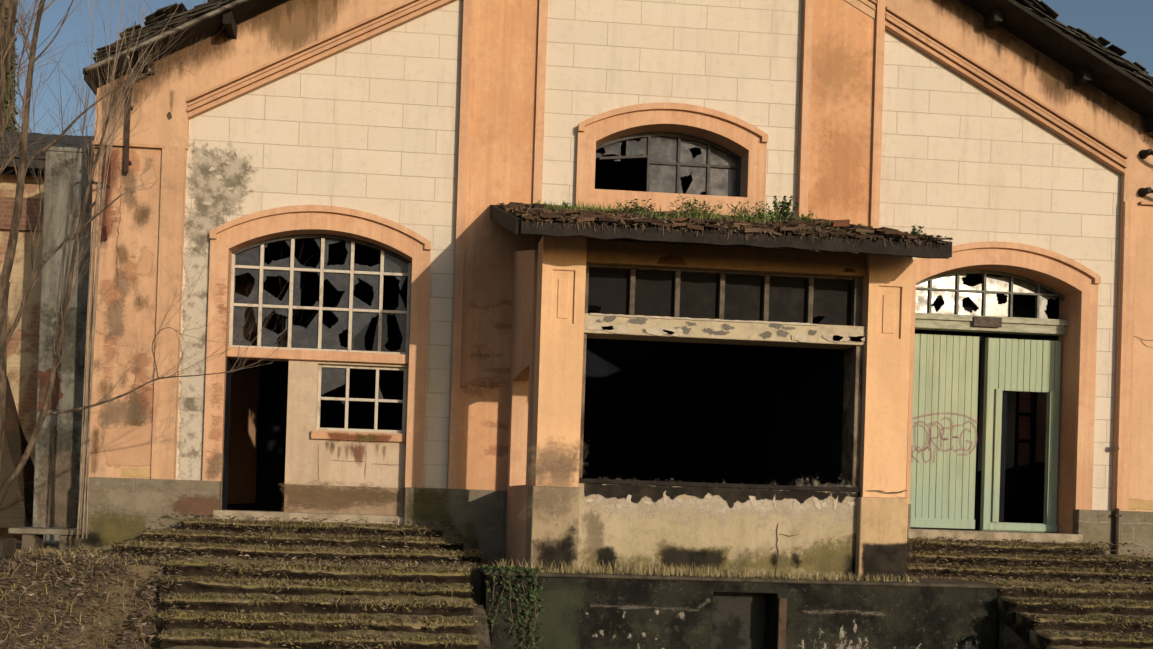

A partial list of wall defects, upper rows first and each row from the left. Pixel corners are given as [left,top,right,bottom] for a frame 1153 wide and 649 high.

water stain [932,0,1153,144]
corrosion [100,146,118,242]
peeling [98,144,255,516]
peeling [587,313,866,343]
peeling [584,483,860,524]
water stain [533,527,673,572]
spalling [658,545,727,569]
crack [769,523,798,570]
water stain [690,534,910,581]